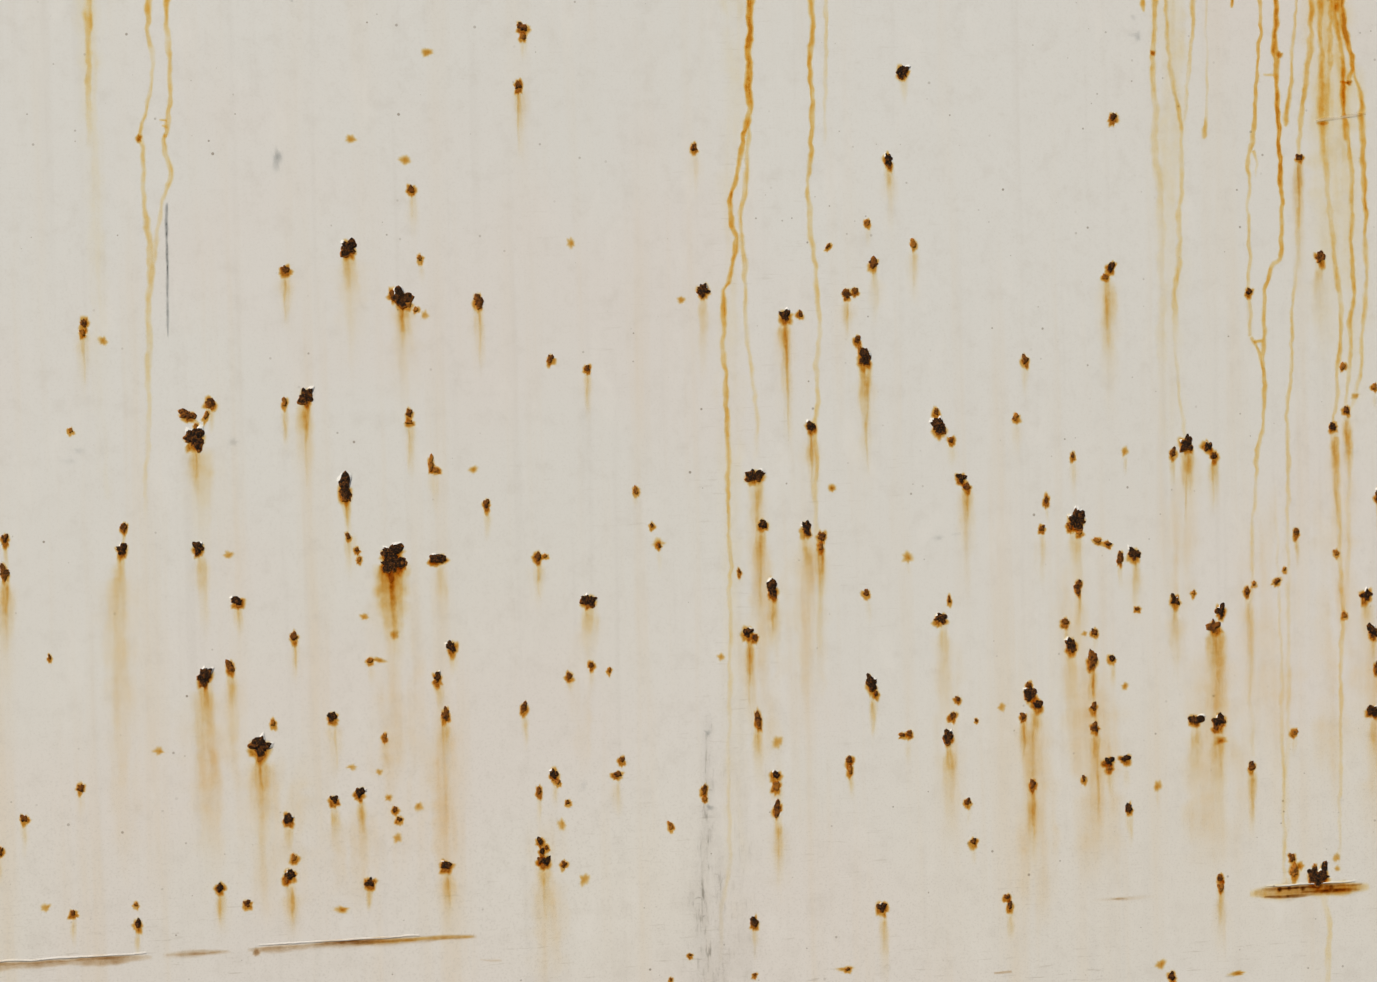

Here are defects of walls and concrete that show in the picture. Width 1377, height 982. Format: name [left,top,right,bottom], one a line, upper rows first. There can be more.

rust [388,285,418,312]
rust [854,335,872,367]
rust [178,398,216,453]
rust [928,408,955,446]
rust [1169,434,1218,463]
rust [337,470,352,503]
rust [1066,505,1141,566]
rust [380,541,408,589]
rust [1020,682,1043,722]
rust [247,720,275,762]
rust [1187,712,1226,742]
rust [1288,853,1329,888]